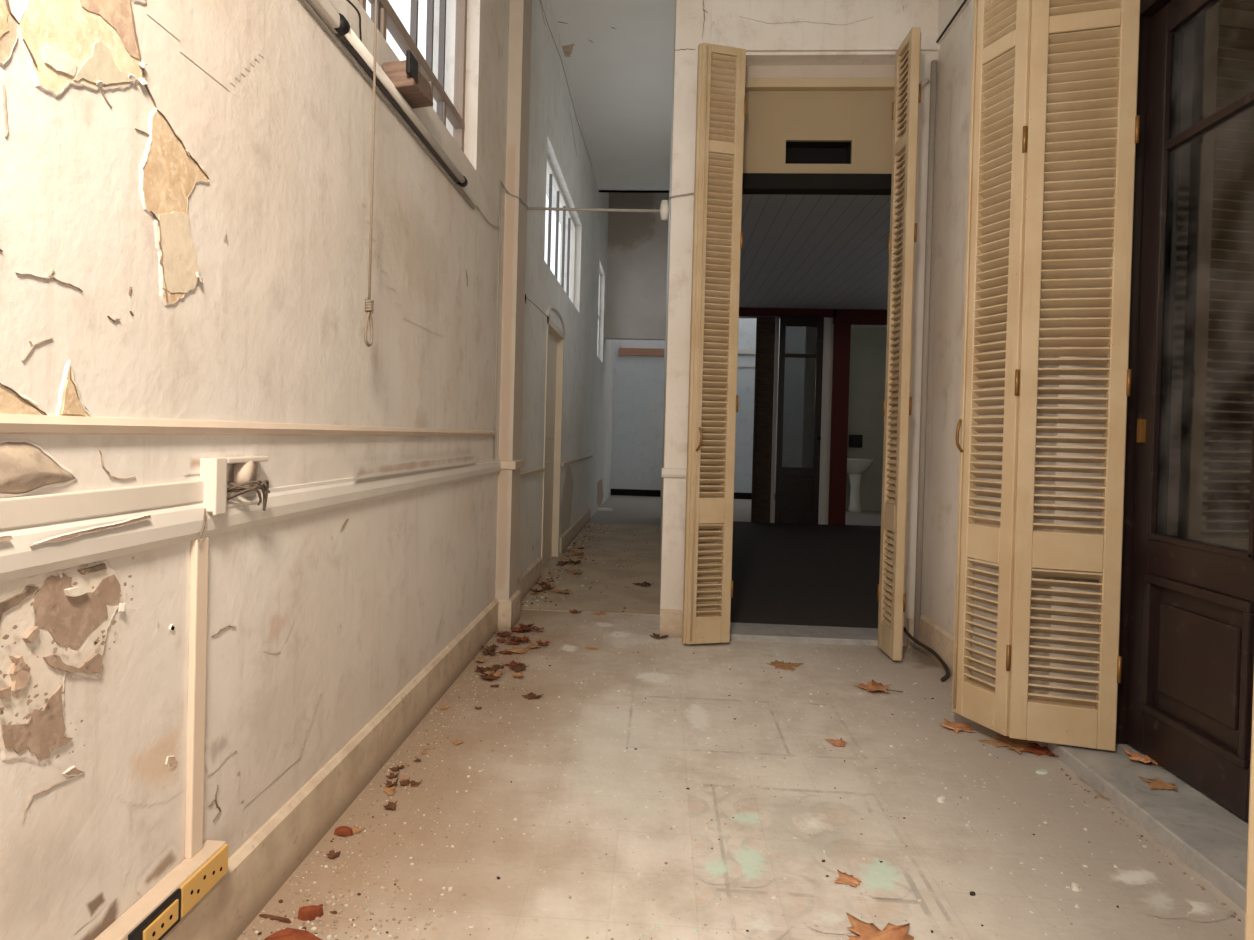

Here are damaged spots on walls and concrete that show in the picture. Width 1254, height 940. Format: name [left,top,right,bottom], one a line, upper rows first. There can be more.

peeling [0,0,149,98]
peeling [138,107,210,307]
crack [0,249,83,292]
peeling [0,360,92,417]
peeling [0,559,134,777]